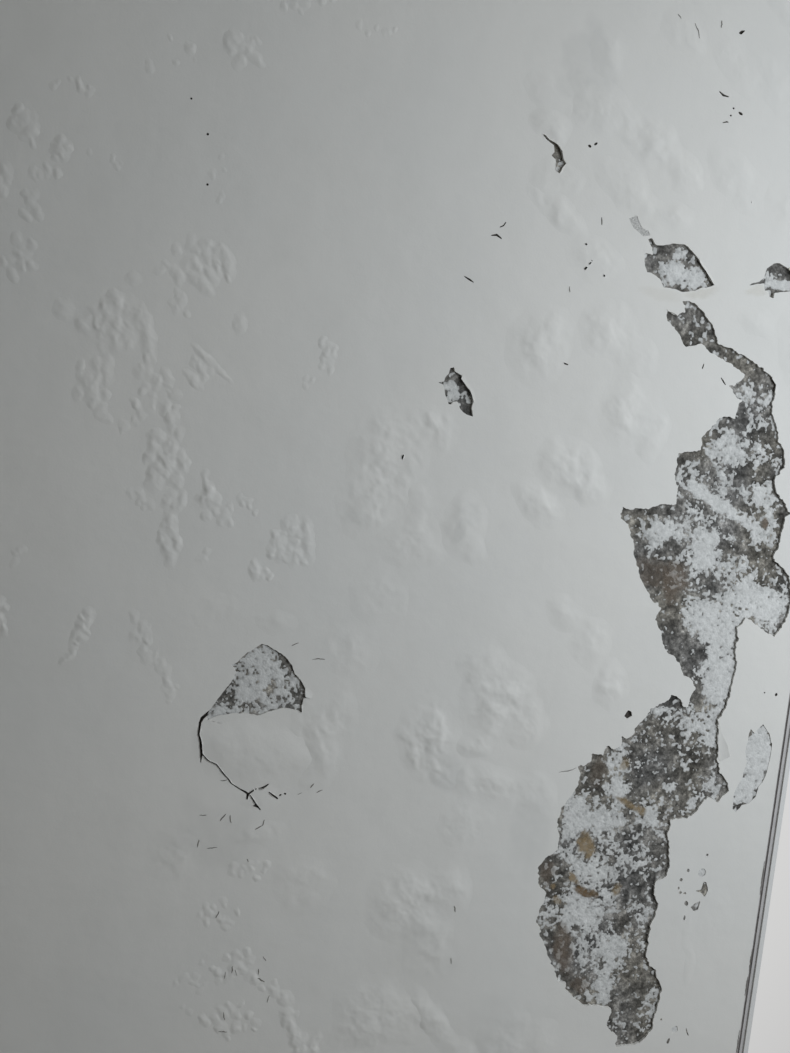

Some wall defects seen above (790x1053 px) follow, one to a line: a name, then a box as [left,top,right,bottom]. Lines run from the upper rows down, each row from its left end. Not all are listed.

spalling [544,135,565,173]
spalling [439,368,475,416]
spalling [536,216,790,1045]
spalling [206,644,313,723]
crack [198,710,322,830]